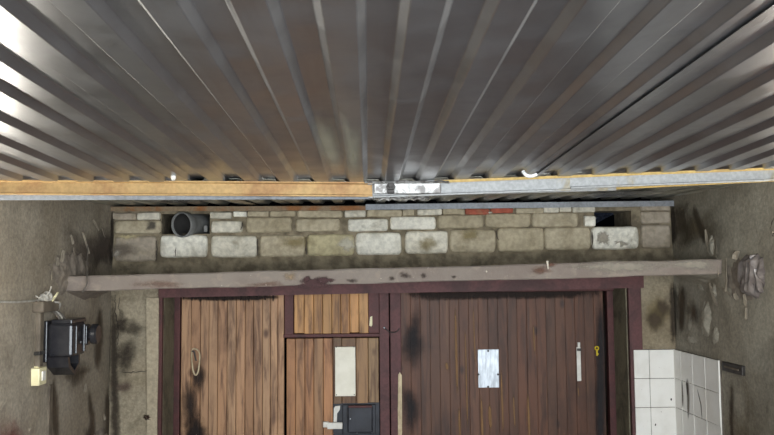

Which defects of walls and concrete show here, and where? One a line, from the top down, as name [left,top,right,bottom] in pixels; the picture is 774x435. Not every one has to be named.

peeling [49,233,90,295]
peeling [705,230,766,319]
leakage [649,287,697,339]
leakage [96,307,140,435]
leakage [86,396,95,435]